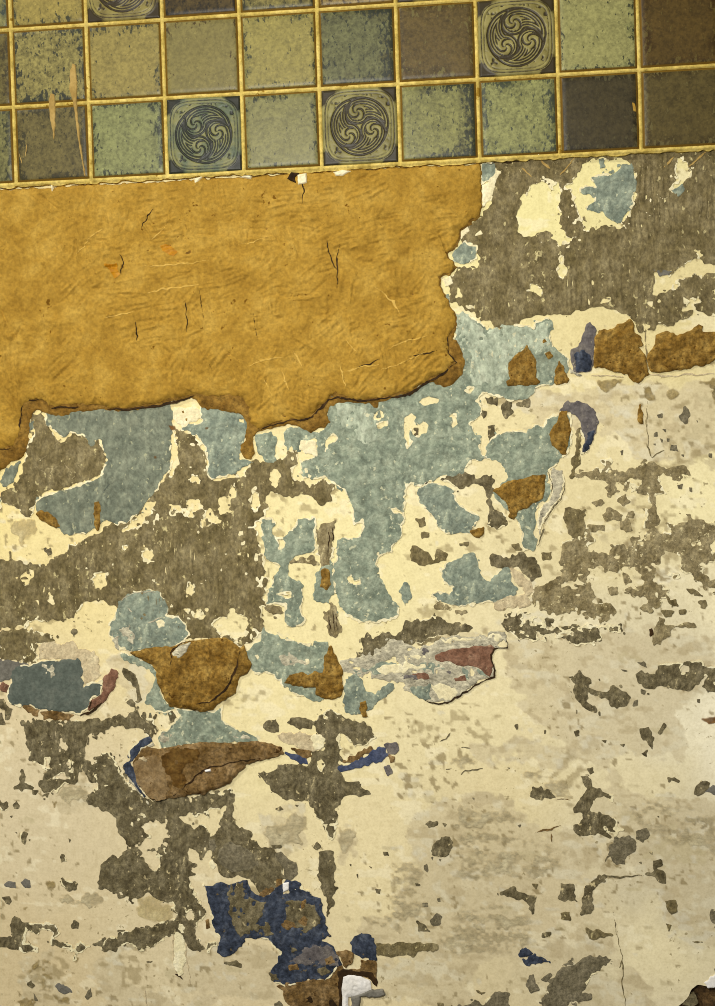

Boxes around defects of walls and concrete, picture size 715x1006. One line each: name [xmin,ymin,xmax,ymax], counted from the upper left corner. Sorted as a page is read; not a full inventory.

spalling [284,150,715,638]
spalling [501,610,625,646]
spalling [649,610,696,645]
spalling [0,401,442,987]
peeling [340,613,508,715]
spalling [569,659,715,716]
spalling [639,723,667,757]
spalling [424,821,453,872]
spalling [558,767,666,921]
spalling [497,884,538,914]
spalling [437,990,510,1006]
spalling [518,947,612,1006]